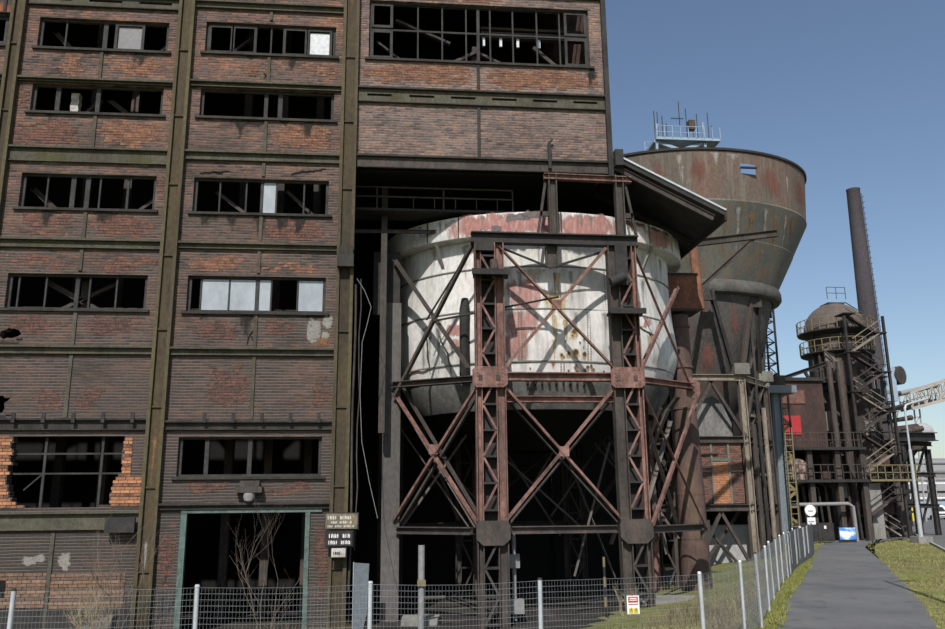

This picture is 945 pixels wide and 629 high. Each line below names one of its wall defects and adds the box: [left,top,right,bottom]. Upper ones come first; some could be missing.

spalling [3,314,67,335]
spalling [82,313,143,335]
peeling [264,316,333,346]
rust [546,273,605,372]
flaking render [0,436,24,508]
flaking render [109,438,142,507]